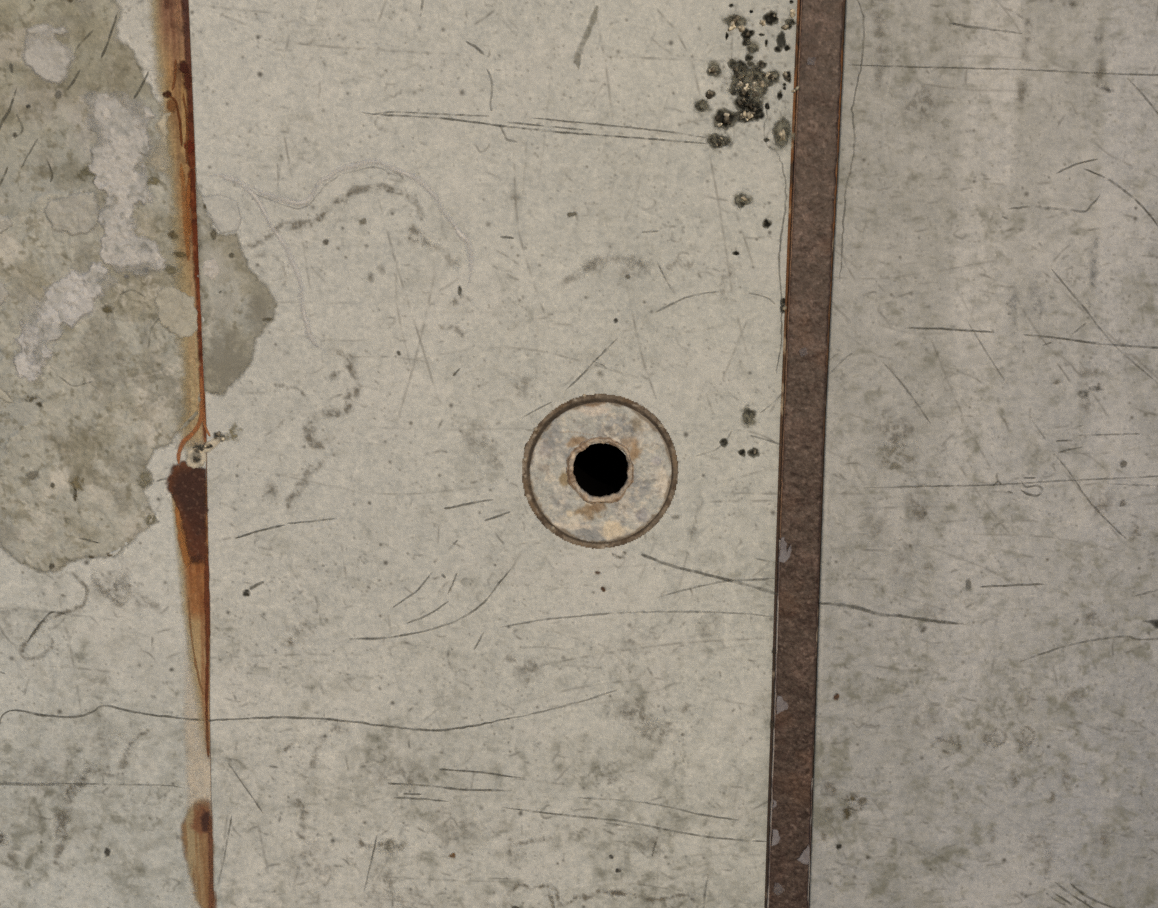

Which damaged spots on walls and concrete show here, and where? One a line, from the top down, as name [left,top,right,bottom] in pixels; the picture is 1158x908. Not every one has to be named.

peeling [0,0,277,573]
corrosion [152,0,210,757]
corrosion [182,801,216,908]